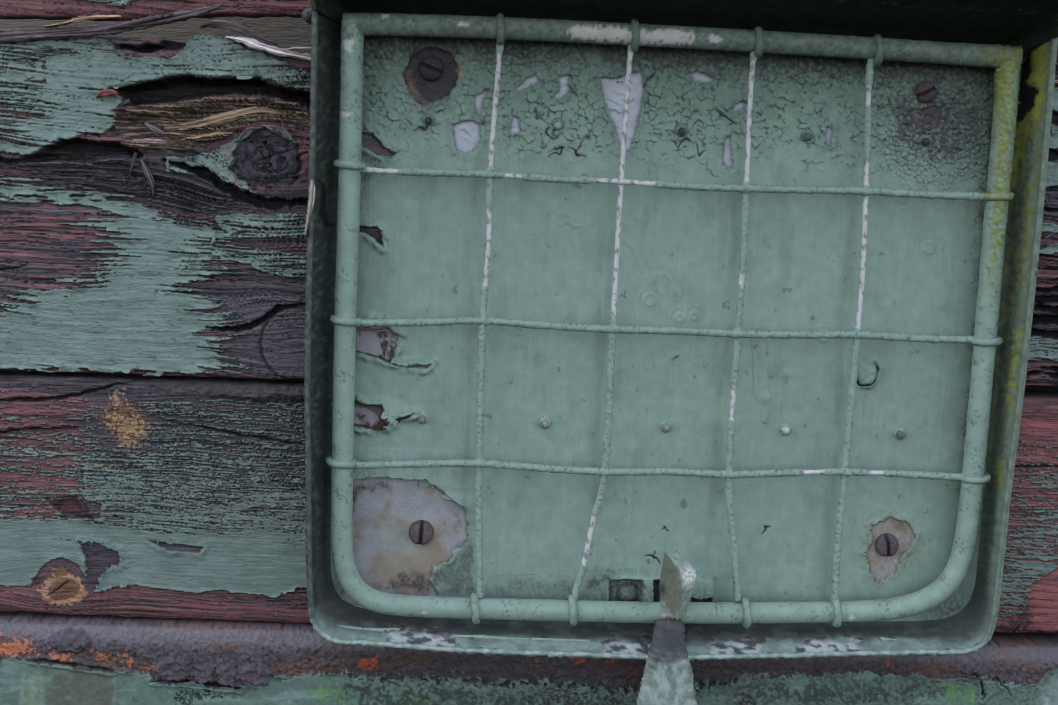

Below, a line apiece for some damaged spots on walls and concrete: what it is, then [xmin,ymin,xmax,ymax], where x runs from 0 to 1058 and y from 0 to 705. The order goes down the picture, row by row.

peeling [0,34,311,154]
peeling [160,121,301,194]
crack [404,110,430,134]
crack [543,126,594,160]
crack [641,64,657,111]
crack [668,106,764,179]
peeling [0,175,308,602]
peeling [354,397,418,434]
peeling [353,472,473,595]
peeling [997,436,1058,620]
corrosion [0,621,646,695]
corrosion [690,644,1058,691]